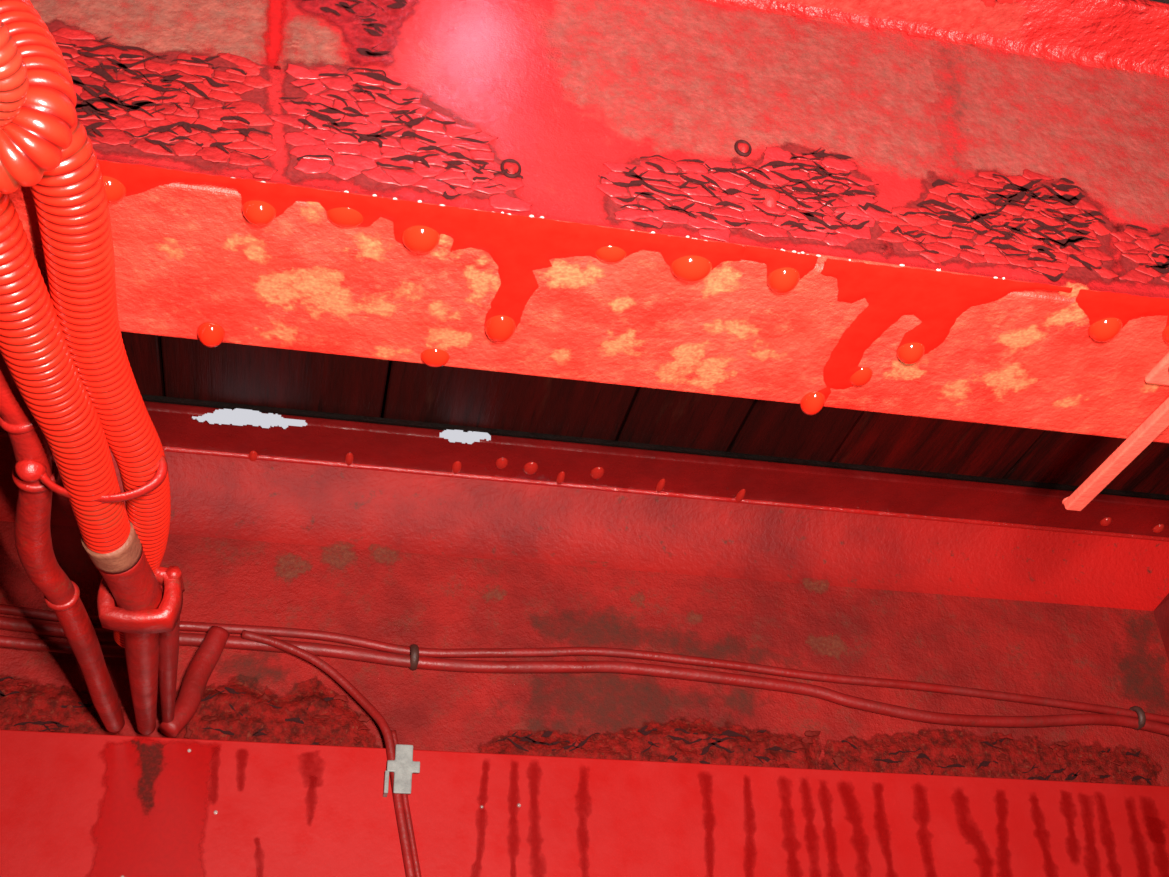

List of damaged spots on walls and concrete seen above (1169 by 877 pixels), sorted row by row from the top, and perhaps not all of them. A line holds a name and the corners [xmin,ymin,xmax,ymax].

peeling [30,0,533,212]
peeling [157,238,183,259]
peeling [301,201,322,219]
water stain [98,160,1169,402]
peeling [544,0,1169,407]
water stain [88,738,220,877]
water stain [472,762,488,877]
water stain [702,775,714,877]
water stain [781,779,838,877]
water stain [957,791,1010,877]
water stain [1063,793,1119,877]
water stain [1128,801,1169,877]